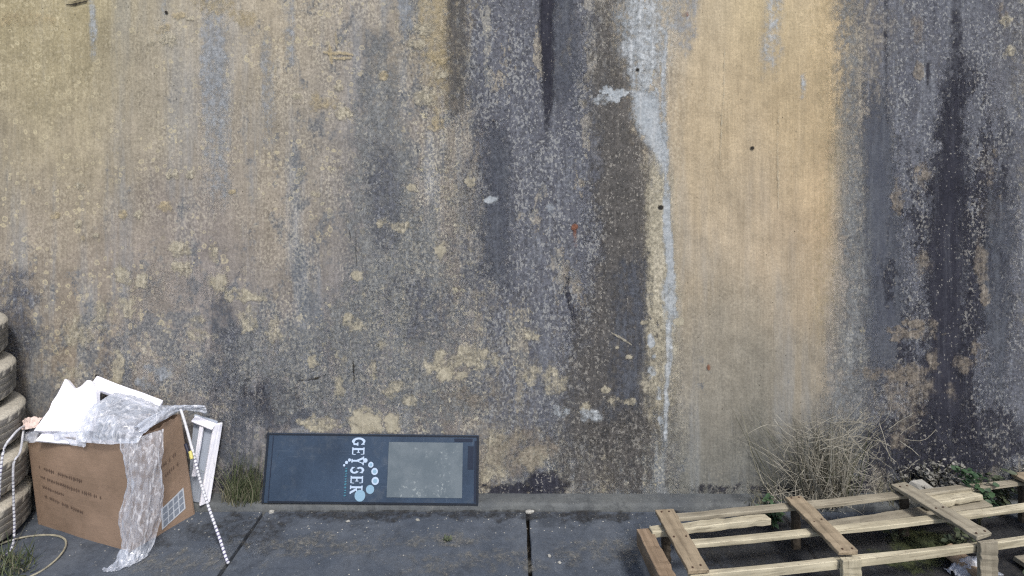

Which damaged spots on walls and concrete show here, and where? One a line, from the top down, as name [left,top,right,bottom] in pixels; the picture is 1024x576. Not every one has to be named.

water stain [444,0,696,494]
water stain [815,0,1024,493]